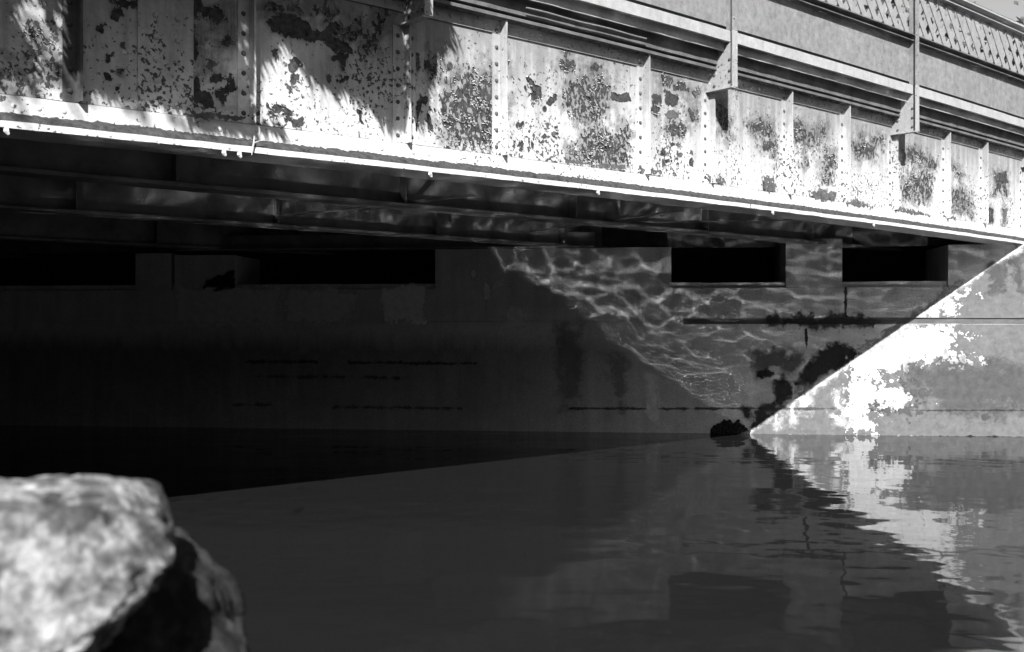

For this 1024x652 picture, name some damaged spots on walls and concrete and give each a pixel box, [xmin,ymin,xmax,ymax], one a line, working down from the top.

peeling [6,15,61,97]
peeling [187,0,238,109]
peeling [266,102,305,128]
peeling [261,0,390,92]
peeling [415,50,510,152]
peeling [513,46,635,172]
peeling [651,72,701,167]
peeling [793,114,838,189]
peeling [851,133,886,160]
peeling [900,143,1009,224]
damp [751,346,804,377]
damp [766,253,1024,435]